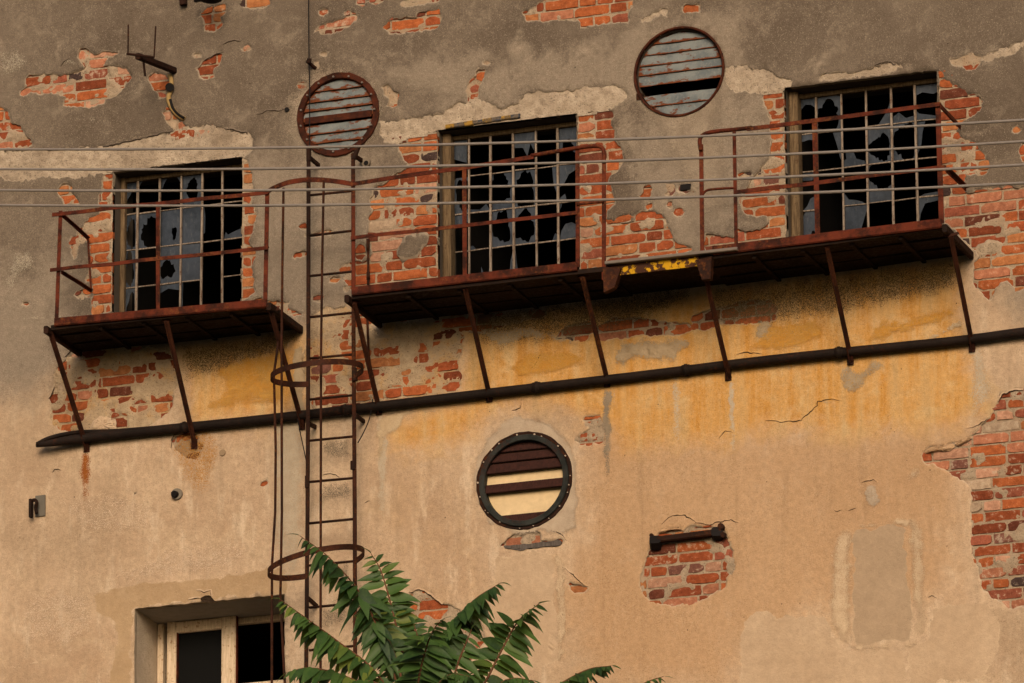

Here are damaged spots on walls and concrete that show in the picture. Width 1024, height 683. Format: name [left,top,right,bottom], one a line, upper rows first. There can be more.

spalling [523,0,633,27]
spalling [20,48,132,108]
spalling [938,42,1024,300]
spalling [0,61,777,459]
crack [765,397,840,423]
rust [79,452,92,502]
rust [173,430,218,492]
spalling [922,388,1024,609]
spalling [502,531,563,546]
spalling [640,525,735,606]
spalling [410,590,461,634]
spalling [457,625,485,662]